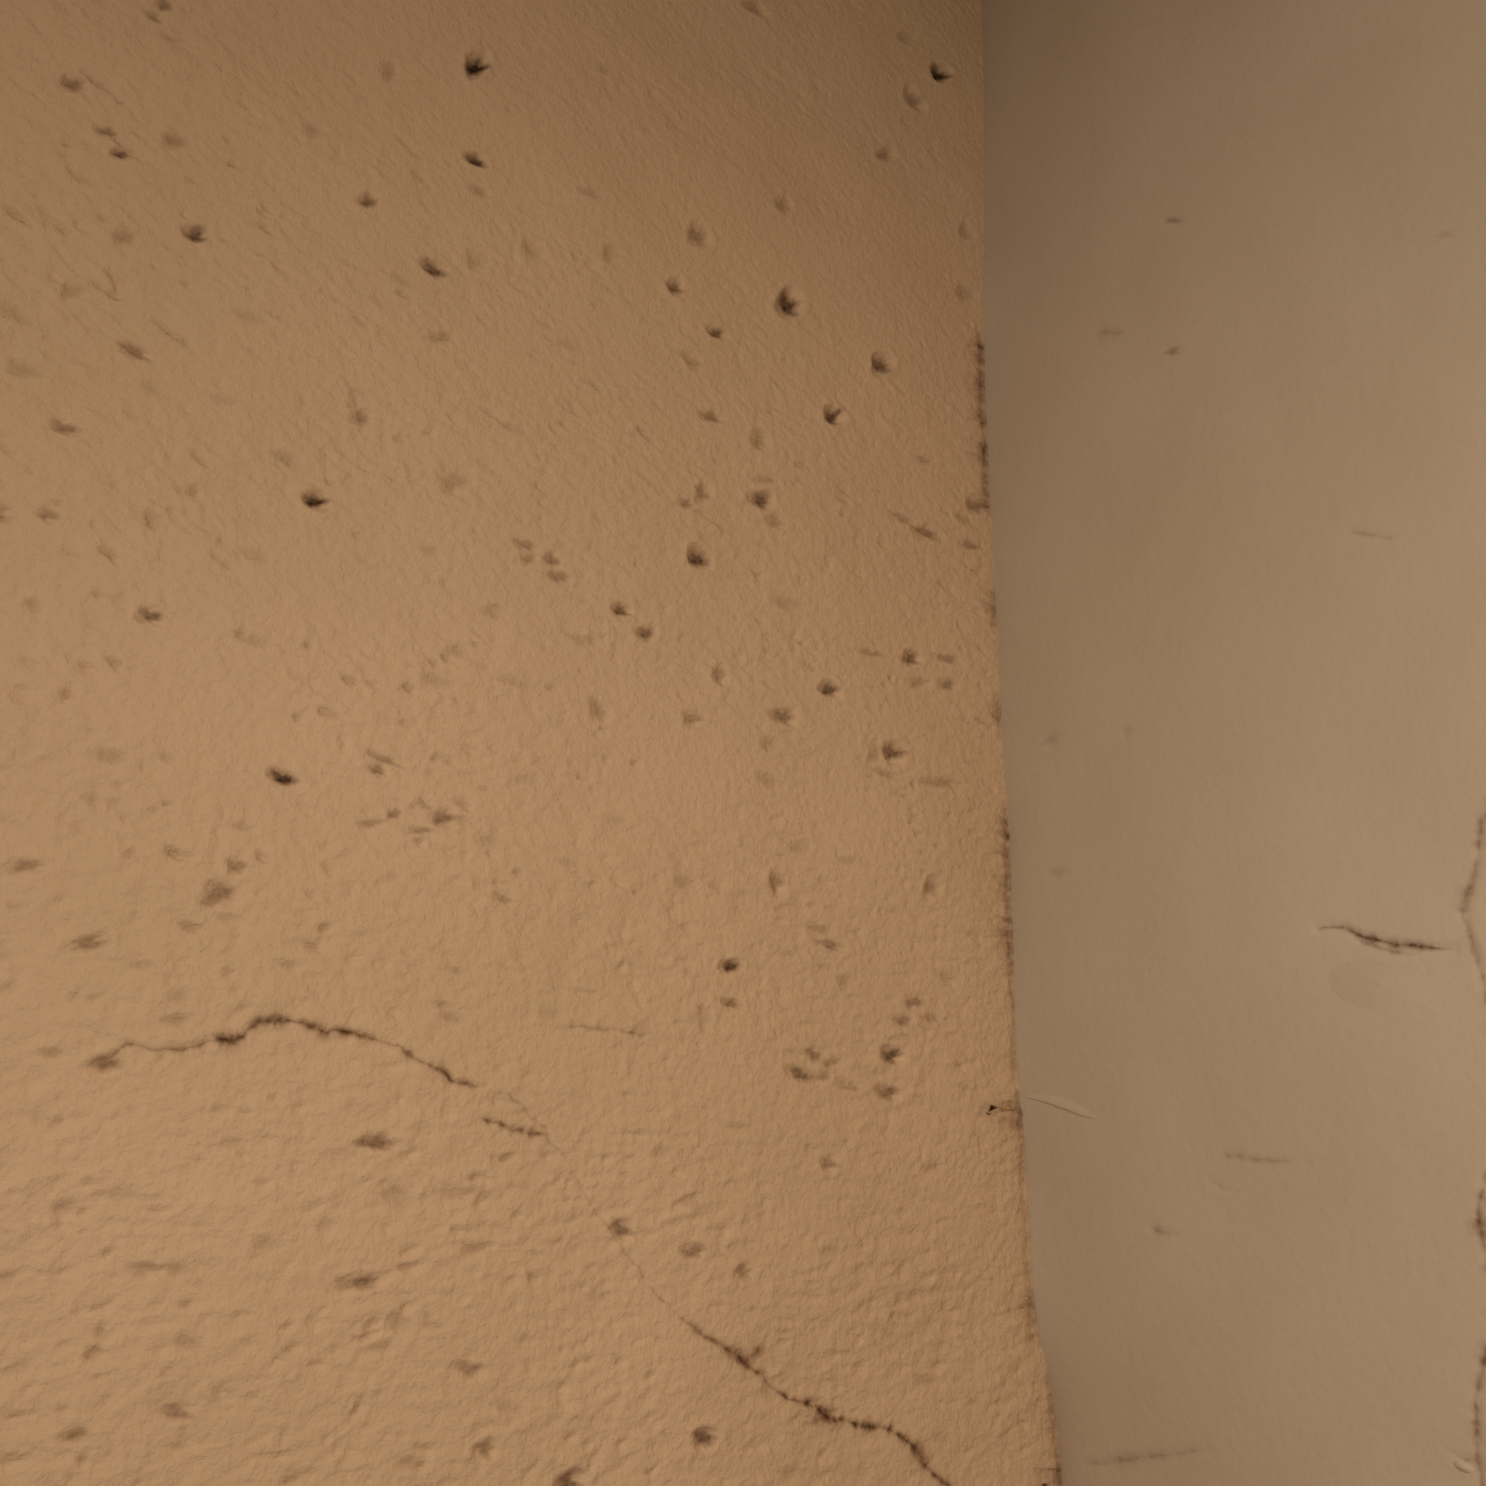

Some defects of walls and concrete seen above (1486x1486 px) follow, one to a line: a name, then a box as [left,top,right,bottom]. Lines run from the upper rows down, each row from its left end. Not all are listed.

crack [1351,930,1437,949]
crack [216,1017,374,1044]
crack [406,1052,468,1084]
crack [699,1332,949,1486]